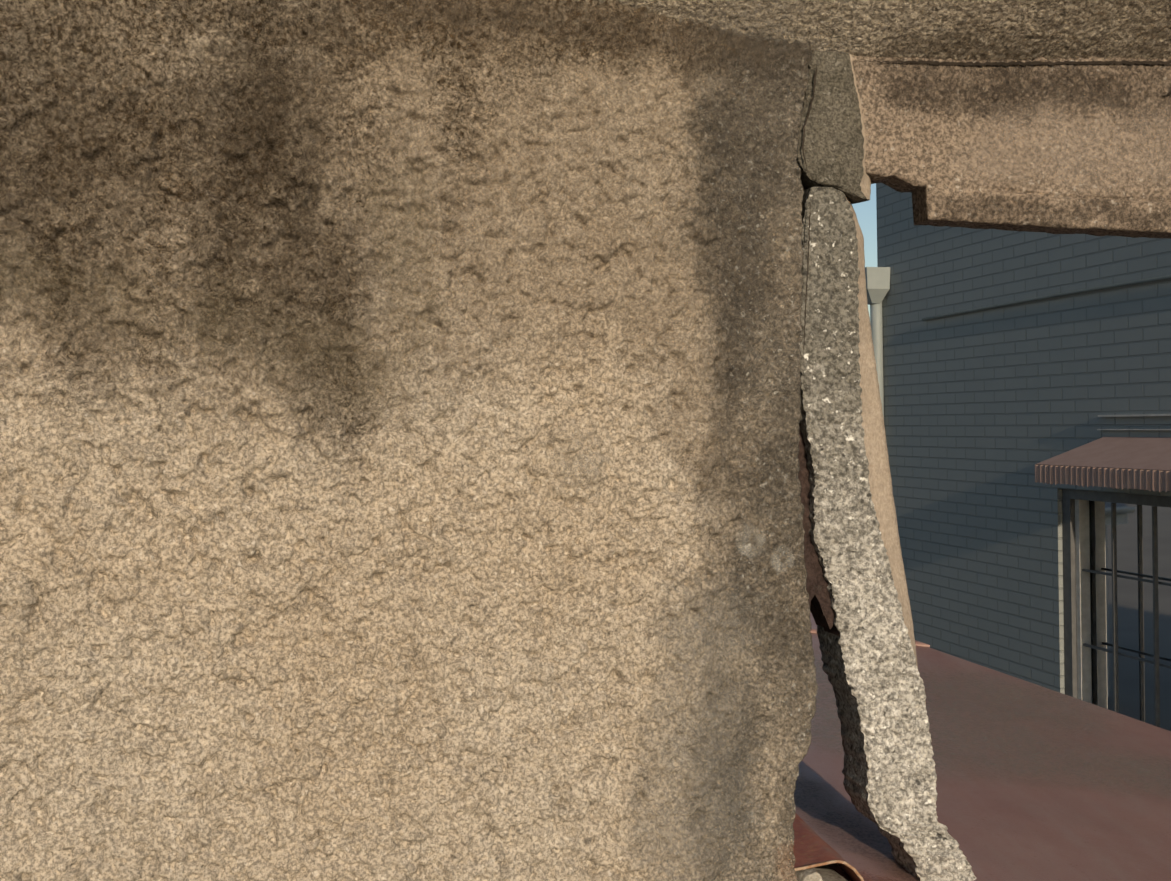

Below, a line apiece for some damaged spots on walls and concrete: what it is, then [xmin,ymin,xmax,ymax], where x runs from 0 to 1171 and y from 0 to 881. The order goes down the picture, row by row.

damp [0,0,818,881]
crack [859,60,1171,95]